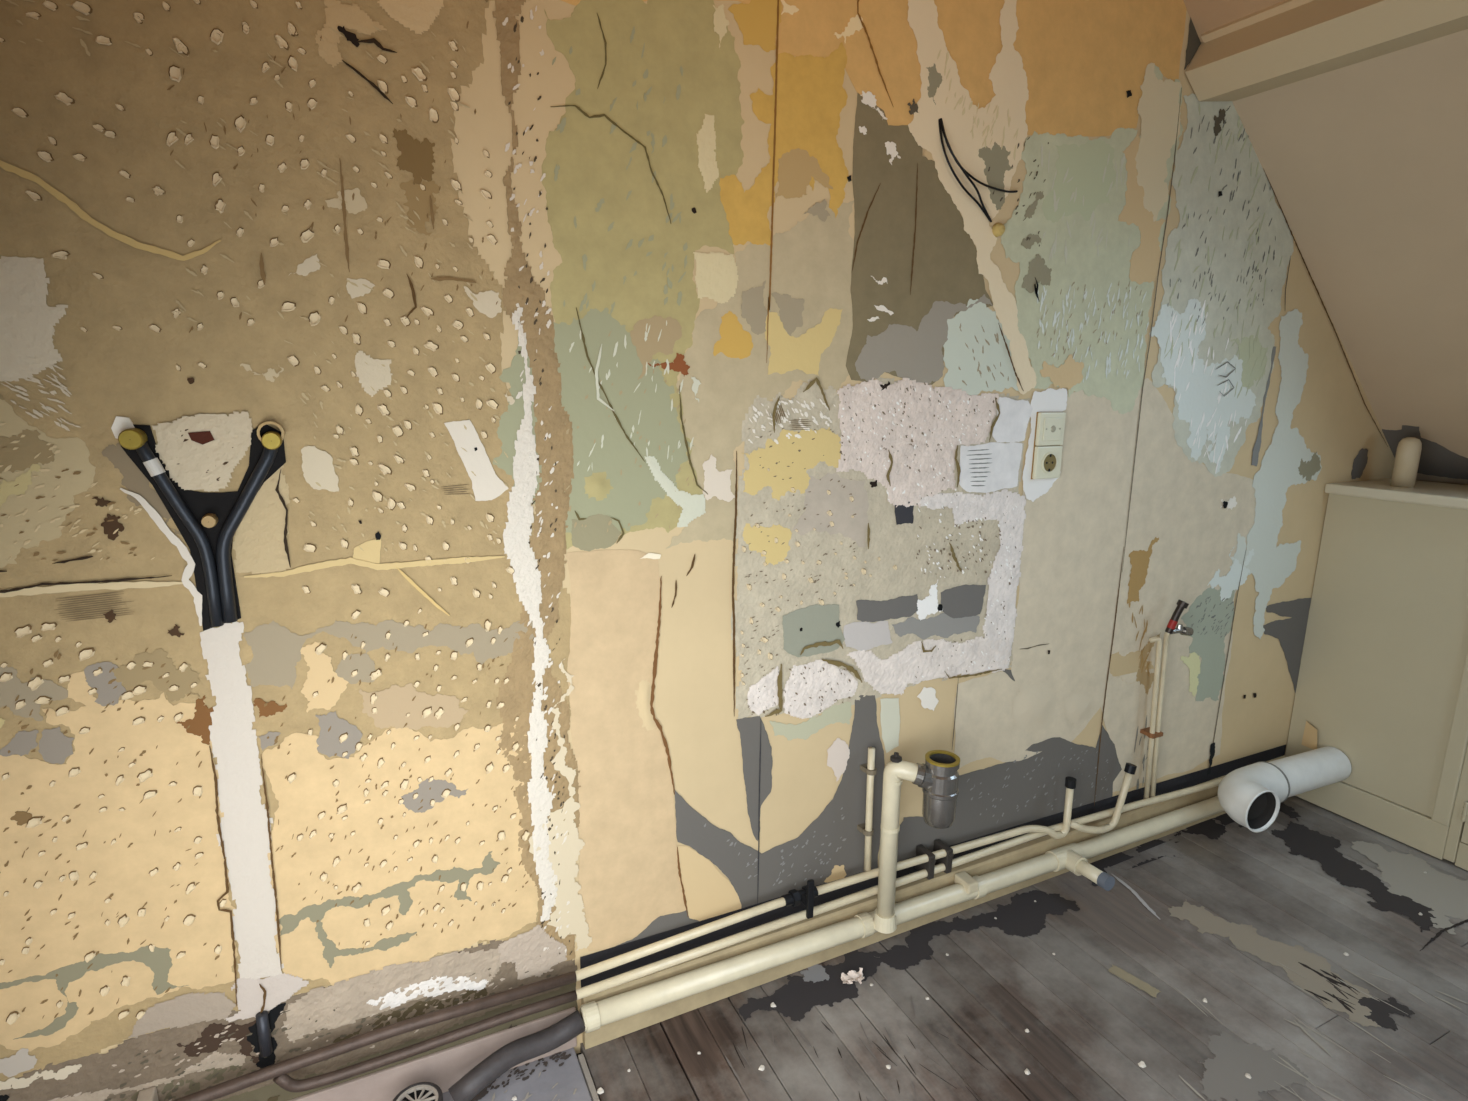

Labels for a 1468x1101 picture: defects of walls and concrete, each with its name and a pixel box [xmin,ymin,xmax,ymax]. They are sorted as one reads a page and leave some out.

flaking render [315,0,444,68]
damp [505,143,546,232]
flaking render [0,256,96,568]
flaking render [111,411,253,492]
flaking render [233,466,290,574]
flaking render [917,580,943,621]
damp [1110,634,1160,694]
damp [528,659,878,988]
flaking render [827,738,850,782]
damp [896,717,1286,878]
flaking render [676,845,741,921]
damp [280,978,512,1051]